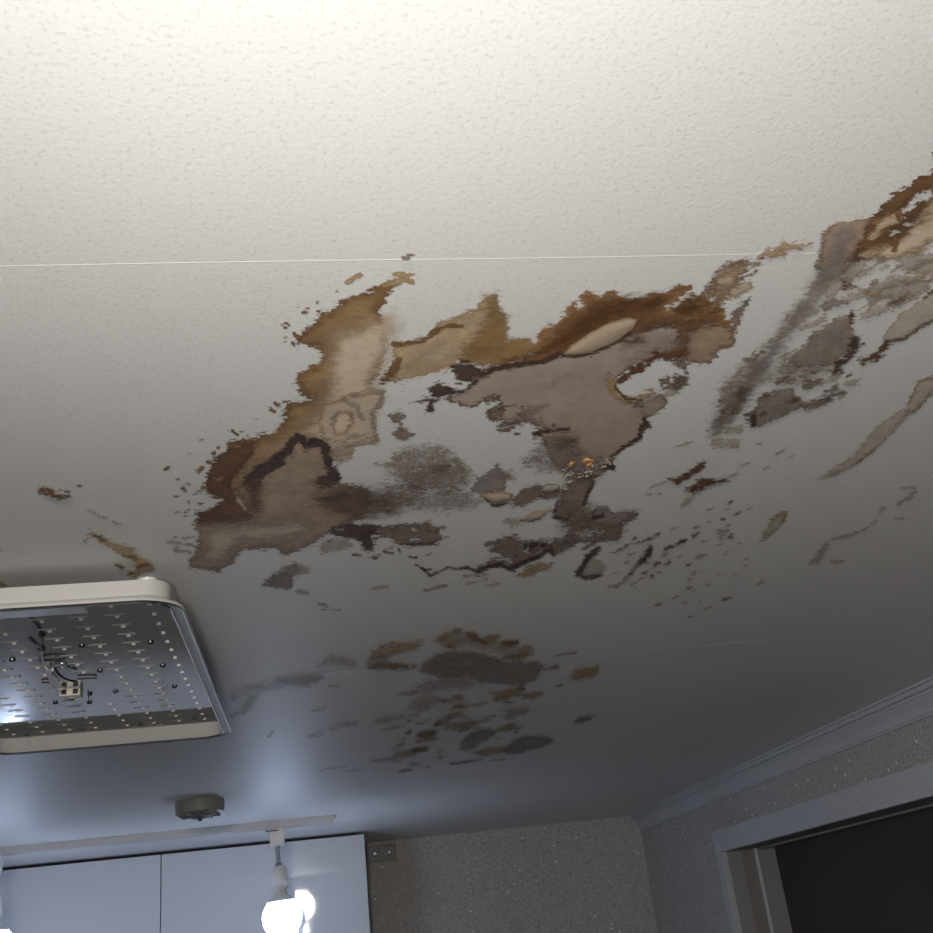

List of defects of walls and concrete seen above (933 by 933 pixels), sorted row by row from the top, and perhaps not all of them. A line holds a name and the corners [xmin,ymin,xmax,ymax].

water stain [166,168,933,611]
flaking render [559,453,611,490]
water stain [83,532,154,578]
water stain [555,665,599,687]
water stain [229,628,577,774]